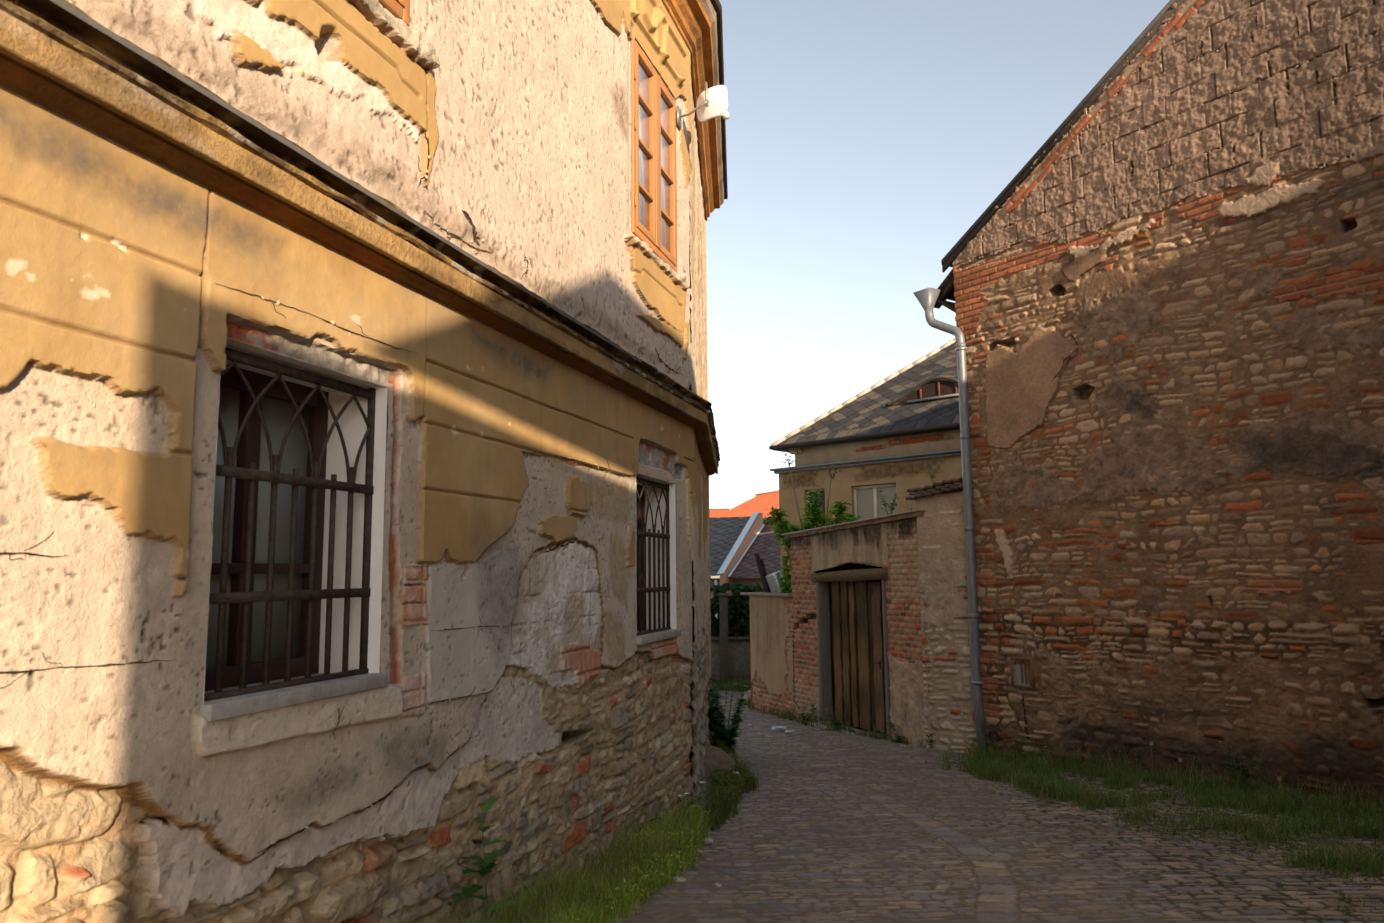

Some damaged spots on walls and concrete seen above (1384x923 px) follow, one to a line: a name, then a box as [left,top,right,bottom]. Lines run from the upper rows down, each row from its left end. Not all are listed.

flaking render [237,32,284,69]
flaking render [254,0,429,130]
flaking render [681,128,690,184]
flaking render [1148,191,1225,230]
flaking render [953,231,1122,332]
flaking render [985,325,1078,448]
crack [0,531,67,560]
flaking render [0,195,695,923]
crack [0,649,172,688]